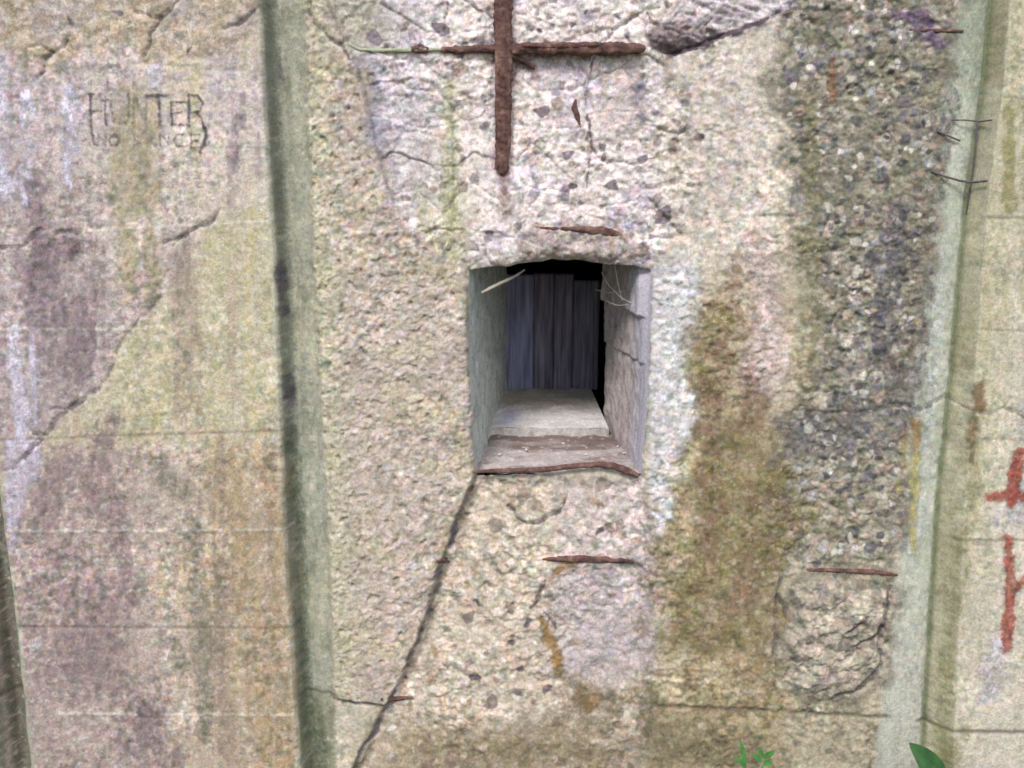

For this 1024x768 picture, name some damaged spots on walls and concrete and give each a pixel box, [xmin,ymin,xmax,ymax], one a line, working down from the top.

rust [348,0,646,216]
crack [585,103,607,183]
rust [534,226,623,237]
leakage [275,261,290,316]
crack [12,305,153,469]
leakage [654,263,698,440]
leakage [650,460,673,535]
rust [542,555,634,580]
rust [807,568,898,576]
crack [333,486,474,768]
rust [539,616,563,676]
crack [838,585,890,696]